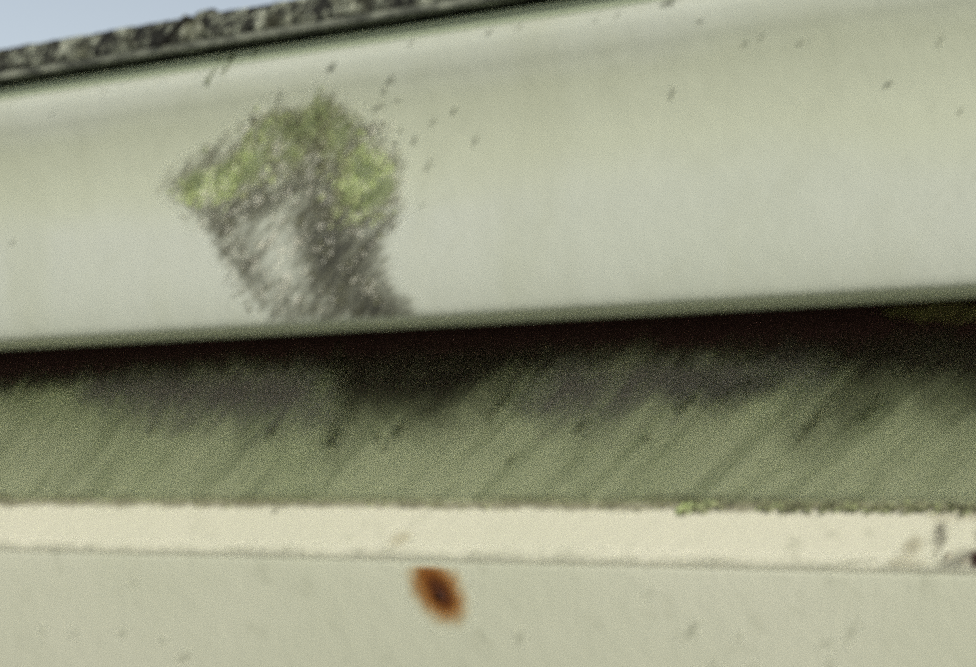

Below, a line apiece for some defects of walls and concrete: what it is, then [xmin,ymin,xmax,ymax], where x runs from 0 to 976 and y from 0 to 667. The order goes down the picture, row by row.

water stain [0,100,976,428]
rust [414,567,462,619]